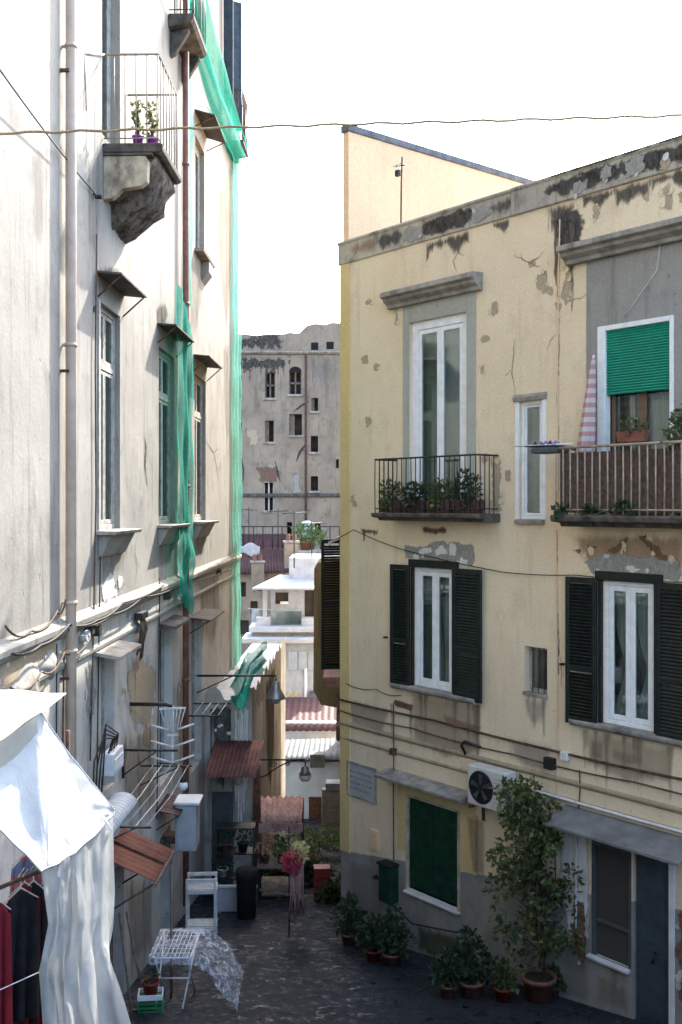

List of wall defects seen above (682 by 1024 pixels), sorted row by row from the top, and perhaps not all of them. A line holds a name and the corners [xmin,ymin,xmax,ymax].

peeling [573,153,645,199]
peeling [644,152,682,210]
leakage [379,230,401,249]
leakage [422,208,472,258]
leakage [491,199,511,232]
leakage [545,135,682,283]
peeling [528,259,573,311]
peeling [256,465,278,483]
peeling [404,541,475,569]
peeling [573,532,682,582]
peeling [122,654,157,747]